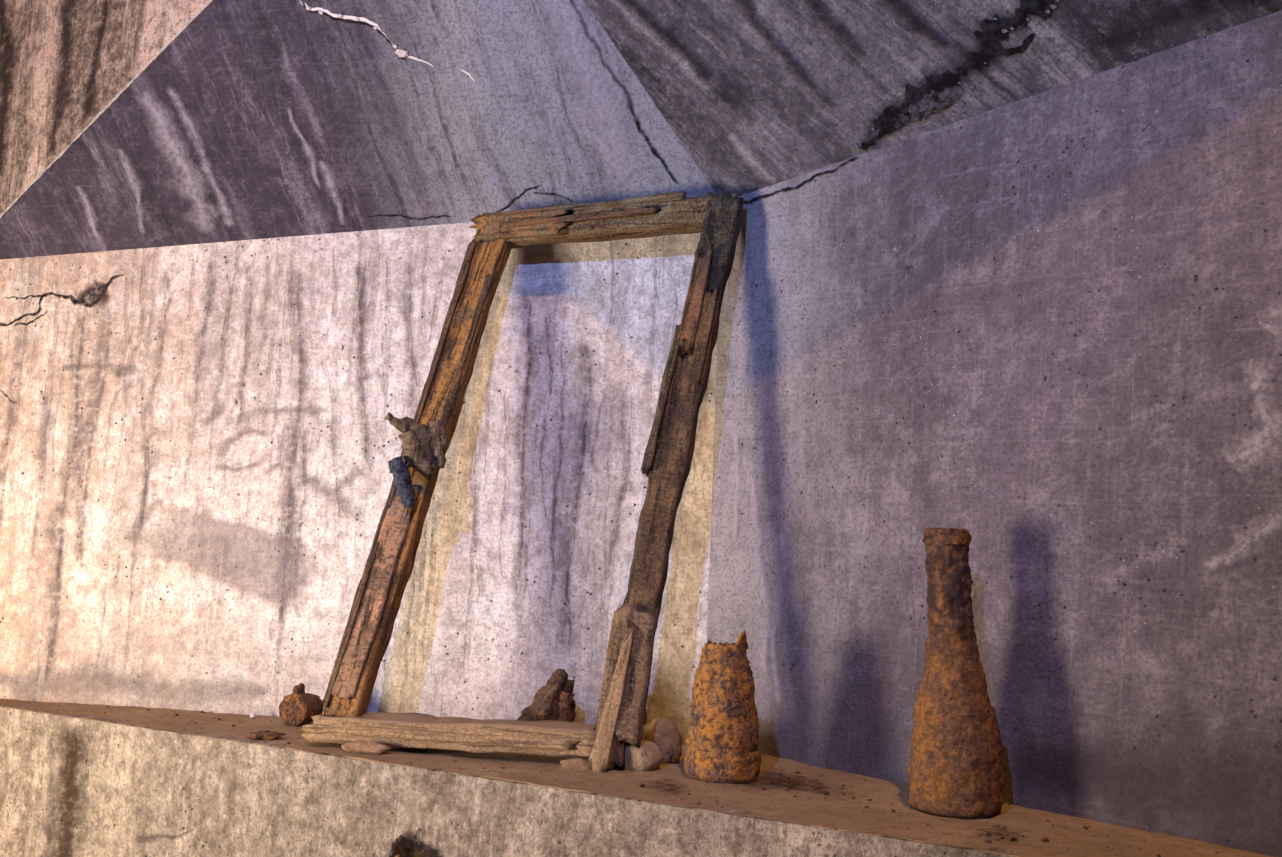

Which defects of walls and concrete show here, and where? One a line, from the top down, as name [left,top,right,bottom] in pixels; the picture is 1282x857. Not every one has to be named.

crack [300,0,475,82]
crack [570,0,678,184]
crack [743,0,1061,203]
crack [369,213,450,221]
crack [495,185,573,213]
crack [0,275,122,326]
water stain [52,735,86,857]
spalling [389,828,440,857]